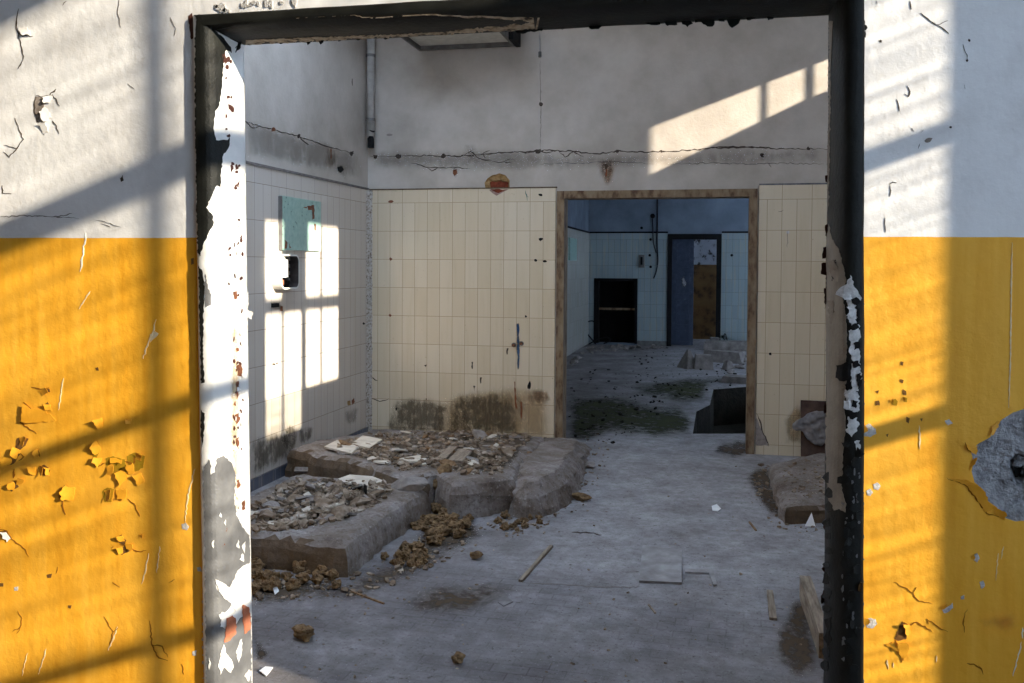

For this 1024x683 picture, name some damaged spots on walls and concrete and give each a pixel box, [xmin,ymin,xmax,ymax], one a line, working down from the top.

crack [16,9,32,68]
crack [910,2,968,60]
crack [5,119,24,157]
peeling [188,13,543,383]
crack [245,72,828,171]
rust [602,162,612,181]
peeling [232,337,244,450]
mould [390,396,515,432]
peeling [820,21,888,672]
flaking render [946,409,1024,521]
peeling [192,456,252,683]
crack [895,582,966,633]